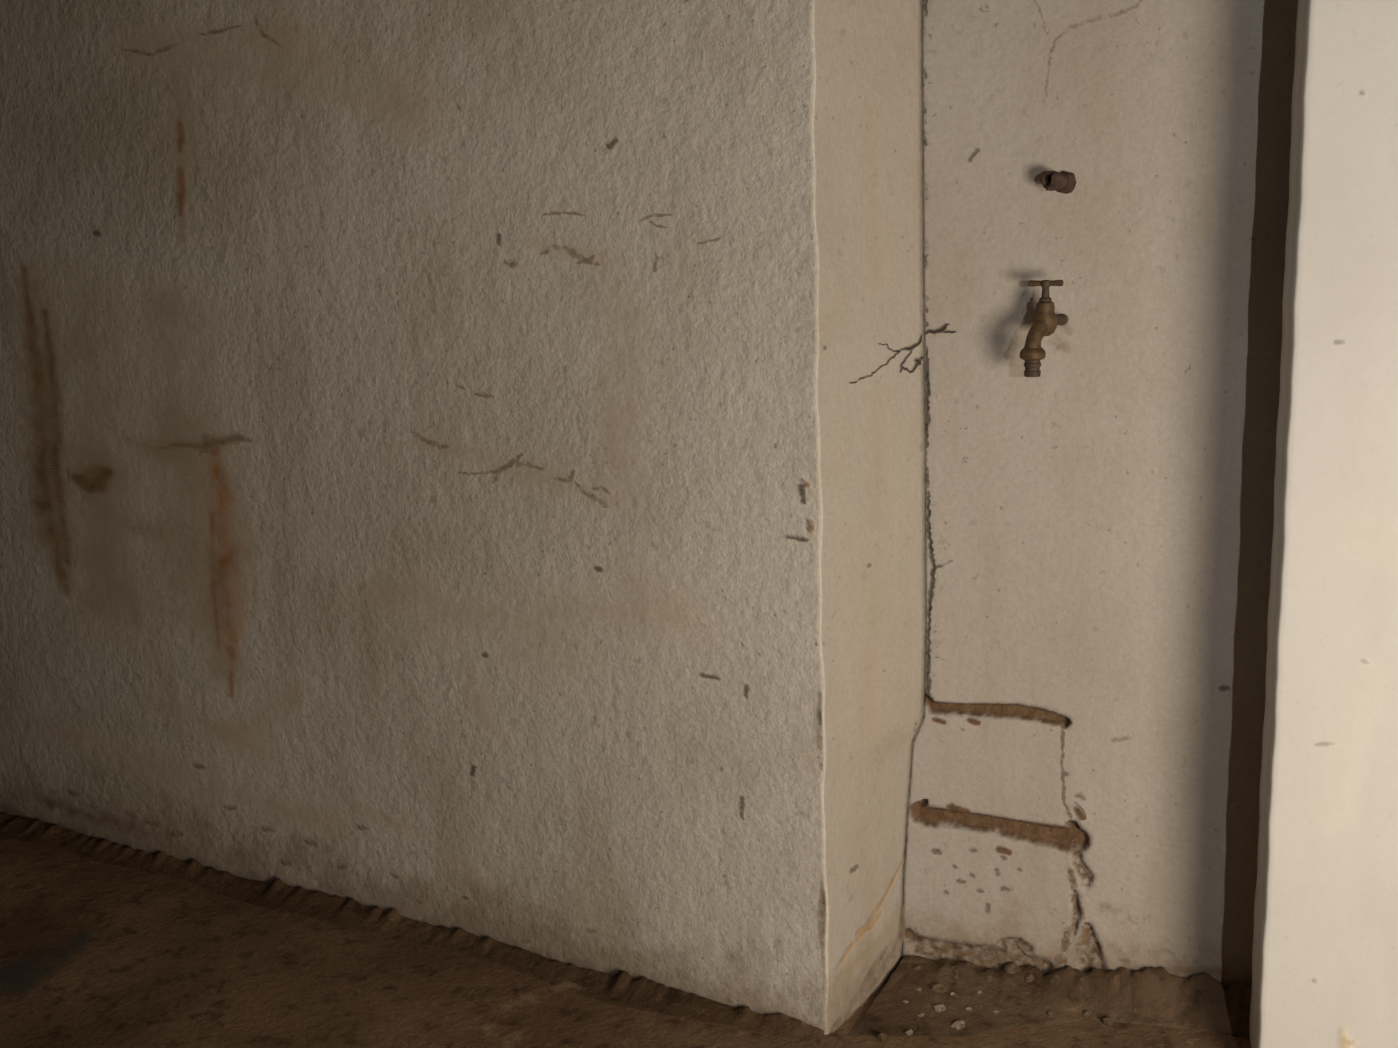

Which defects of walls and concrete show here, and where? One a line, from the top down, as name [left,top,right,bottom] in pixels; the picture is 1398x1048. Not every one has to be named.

crack [921,0,929,16]
rust [23,267,114,594]
crack [850,255,957,744]
spalling [925,695,1073,730]
spalling [902,799,1105,974]